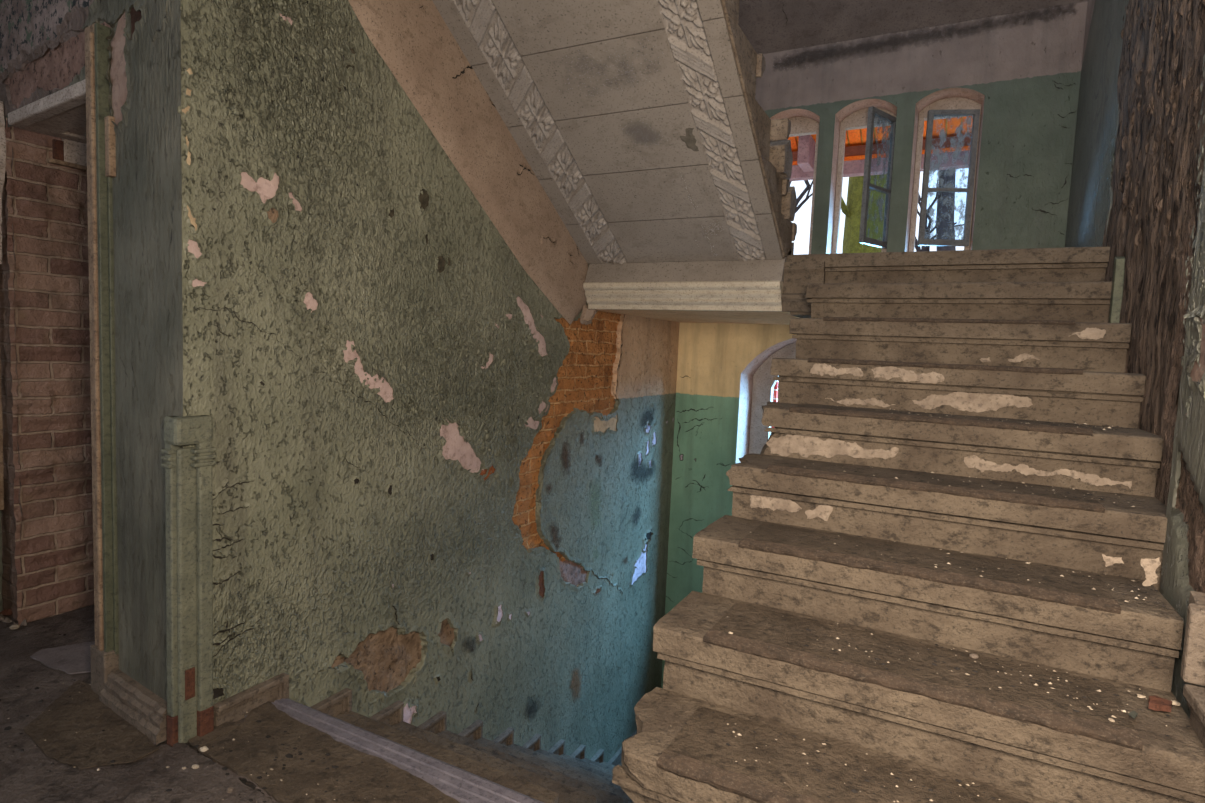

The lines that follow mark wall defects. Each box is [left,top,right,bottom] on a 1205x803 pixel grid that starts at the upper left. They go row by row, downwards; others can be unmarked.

spalling [0,0,147,135]
spalling [1118,0,1205,593]
peeling [810,363,1033,412]
crack [212,457,254,585]
peeling [435,415,498,485]
spalling [476,290,627,644]
crack [666,407,729,602]
peeling [750,494,833,521]
peeling [766,434,899,459]
peeling [964,455,1132,488]
peeling [1102,554,1124,567]
crack [213,615,260,657]